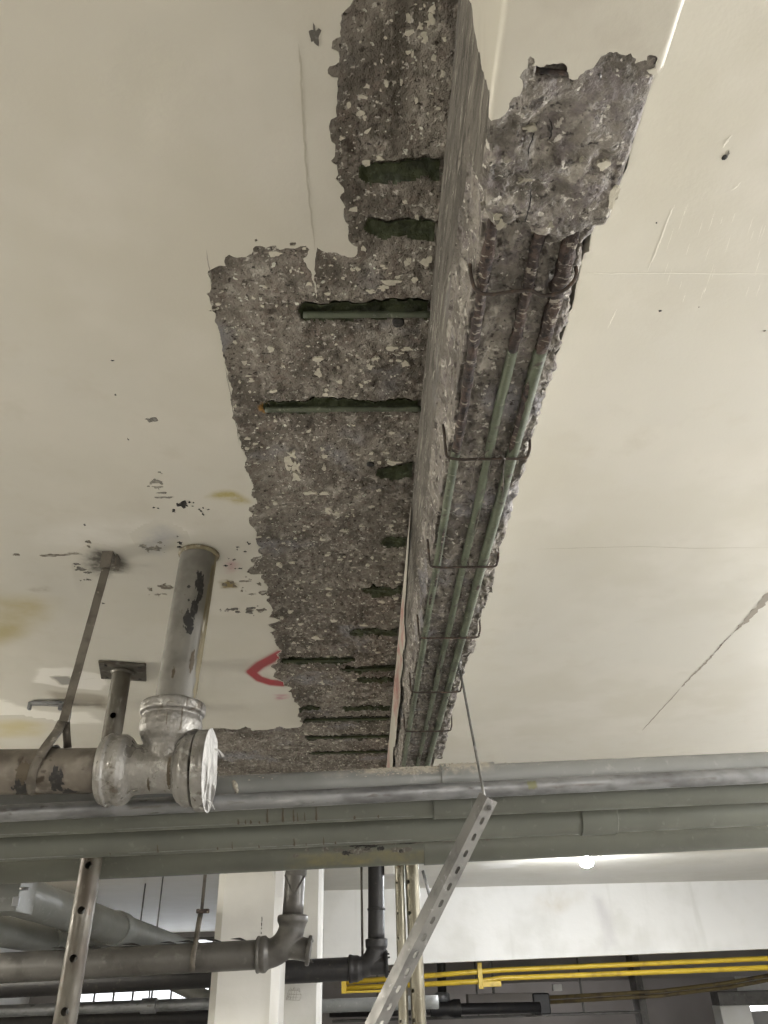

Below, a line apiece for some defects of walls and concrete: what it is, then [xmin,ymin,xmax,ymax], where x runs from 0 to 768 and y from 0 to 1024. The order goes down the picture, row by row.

spalling [207,0,657,776]
peeling [147,472,210,516]
peeling [40,540,92,581]
peeling [139,536,182,553]
peeling [183,571,204,635]
crack [644,593,768,728]